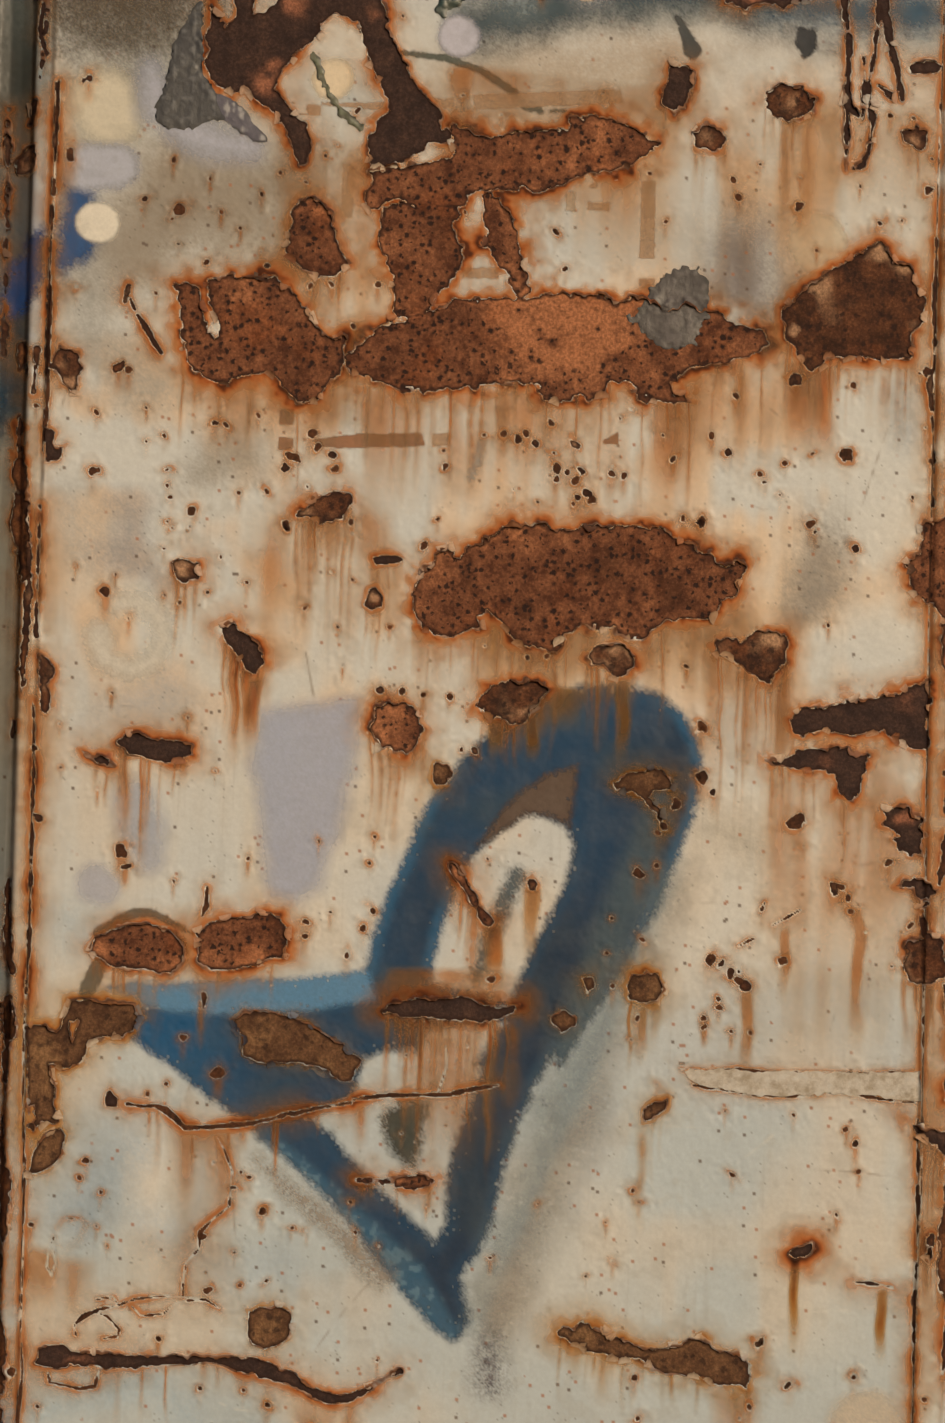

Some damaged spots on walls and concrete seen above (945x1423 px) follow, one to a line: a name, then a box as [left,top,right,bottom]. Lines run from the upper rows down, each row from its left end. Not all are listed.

corrosion [154,0,945,1125]
corrosion [842,1125,861,1177]
corrosion [547,1313,764,1419]
corrosion [789,1271,799,1329]
corrosion [875,1290,887,1346]
corrosion [896,1111,945,1423]